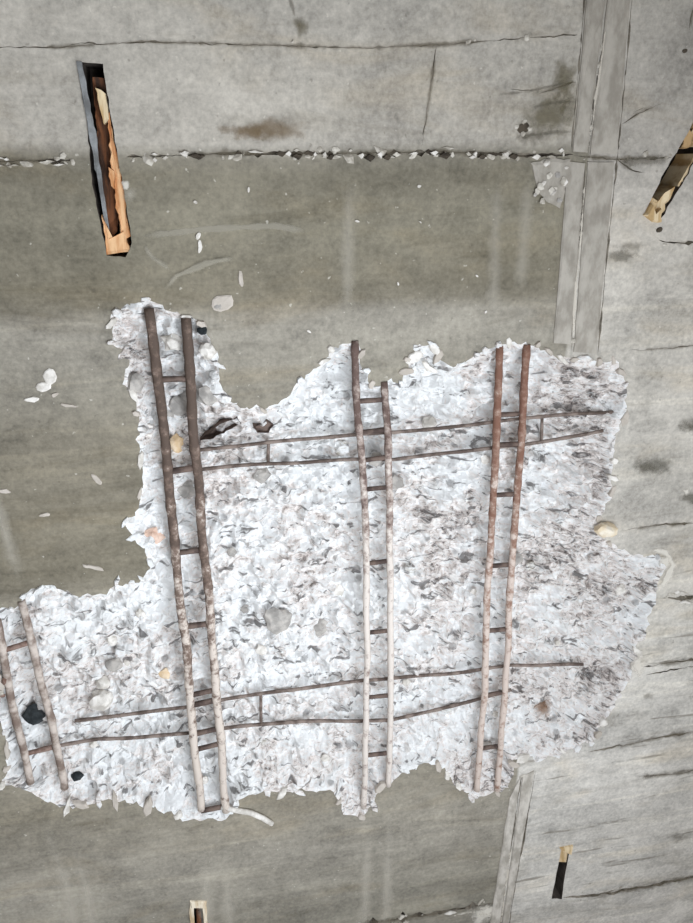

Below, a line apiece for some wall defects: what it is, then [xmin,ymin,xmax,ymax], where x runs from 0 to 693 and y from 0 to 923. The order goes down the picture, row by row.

crack [0,0,672,350]
crack [657,237,693,246]
spalling [0,295,666,821]
crack [368,771,536,923]
crack [563,876,693,902]